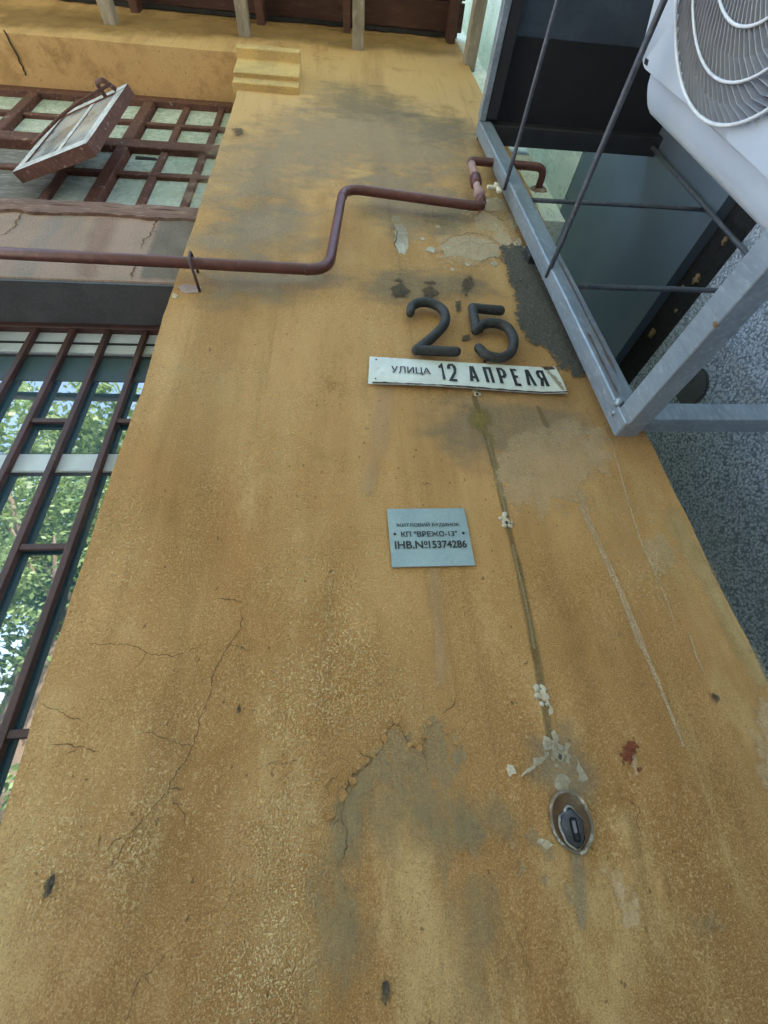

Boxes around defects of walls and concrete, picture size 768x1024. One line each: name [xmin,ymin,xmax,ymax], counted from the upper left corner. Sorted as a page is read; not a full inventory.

crack [3,30,27,76]
leakage [142,206,306,278]
leakage [363,175,461,231]
flaking render [392,197,525,272]
leakage [445,395,585,791]
crack [43,704,100,755]
crack [91,598,250,870]
peeling [507,730,588,791]
rust [620,737,643,772]
peeling [213,669,470,1023]
crack [124,951,168,1022]